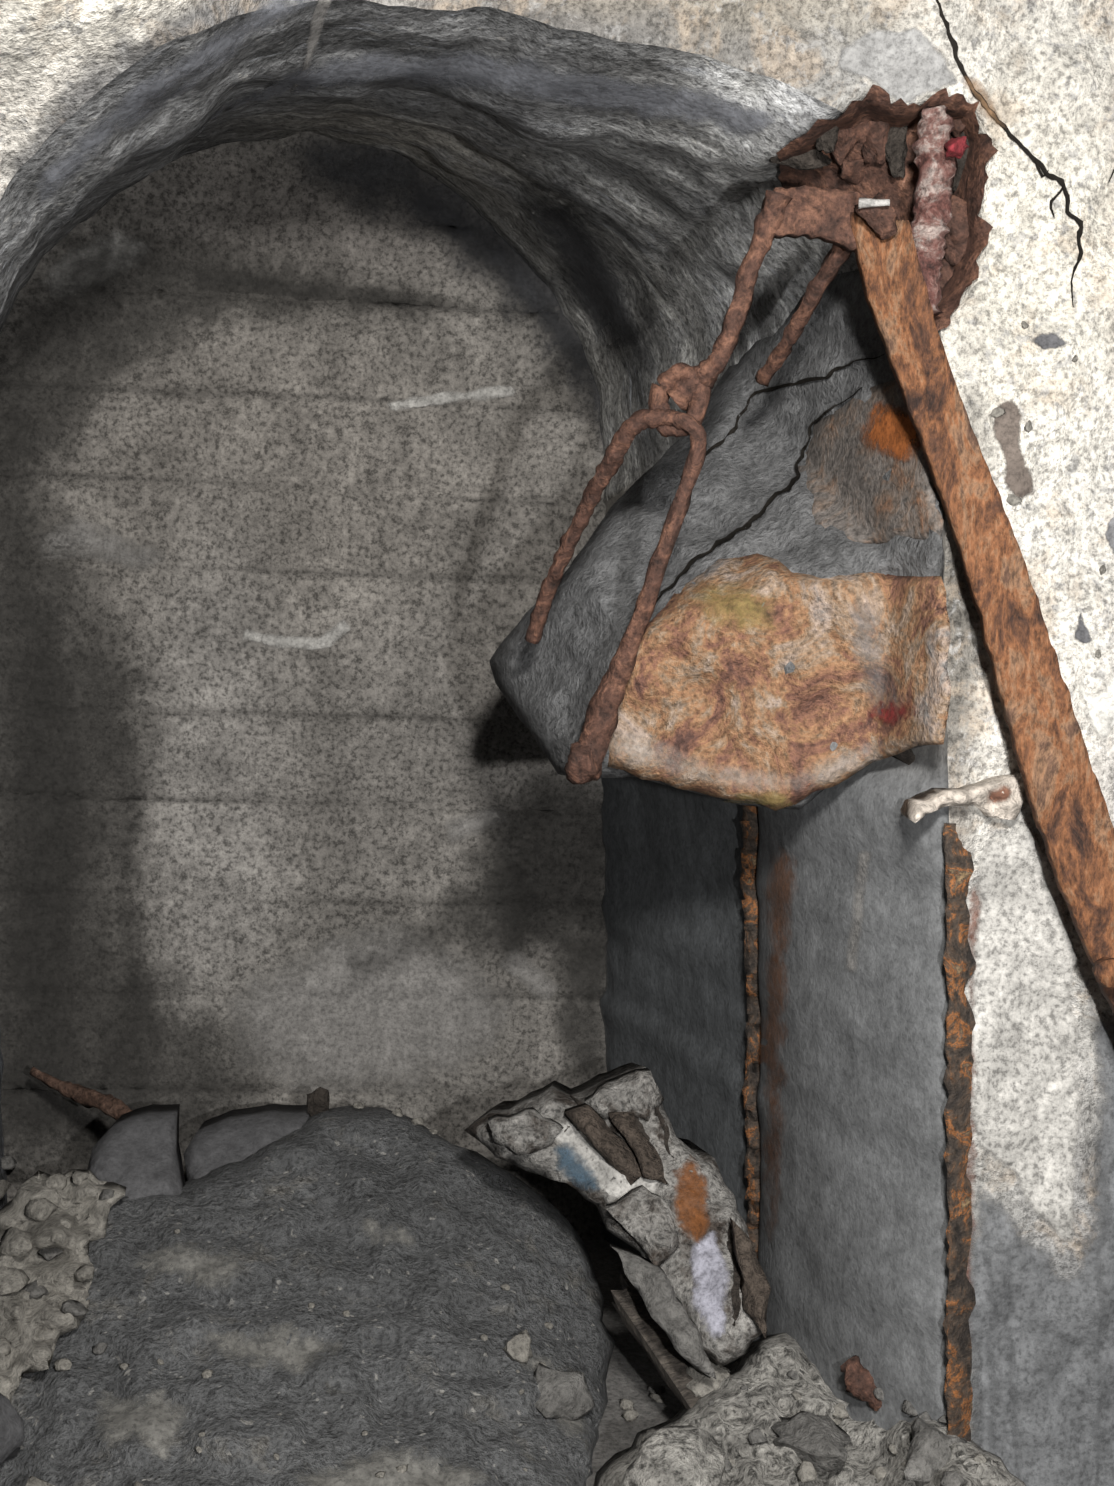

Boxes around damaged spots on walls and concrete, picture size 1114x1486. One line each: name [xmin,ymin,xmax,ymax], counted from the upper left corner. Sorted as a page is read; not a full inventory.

spalling [769,28,998,331]
crack [936,0,1083,307]
corrosion [608,553,951,811]
corrosion [970,896,982,959]